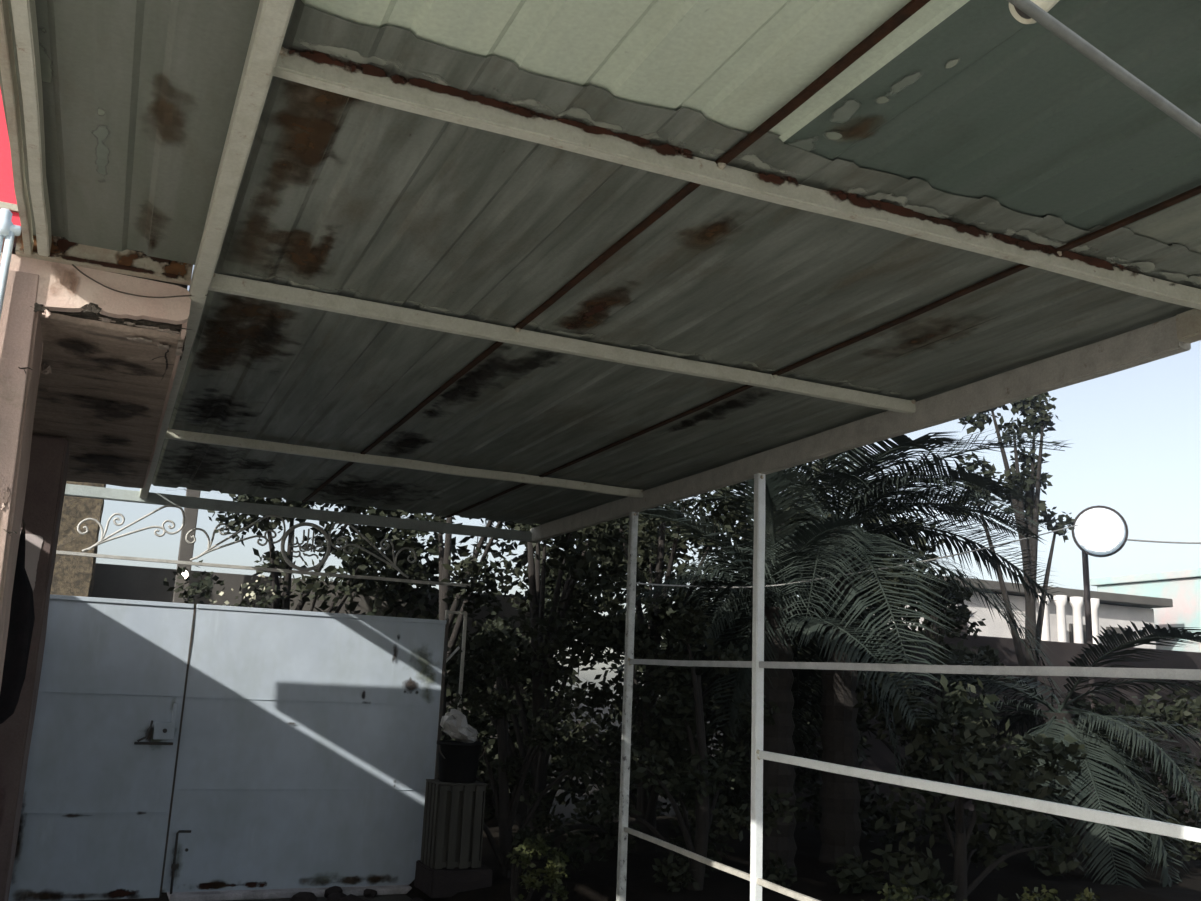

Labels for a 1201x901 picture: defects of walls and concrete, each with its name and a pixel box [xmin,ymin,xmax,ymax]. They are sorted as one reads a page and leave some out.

corrosion [265,82,360,206]
corrosion [287,48,694,159]
peeling [788,100,860,152]
corrosion [757,172,799,186]
corrosion [14,210,191,279]
corrosion [270,230,333,276]
corrosion [828,190,1138,276]
corrosion [559,289,629,333]
leakage [58,342,154,375]
leakage [416,652,434,700]
corrosion [197,880,267,889]
corrosion [303,875,394,885]